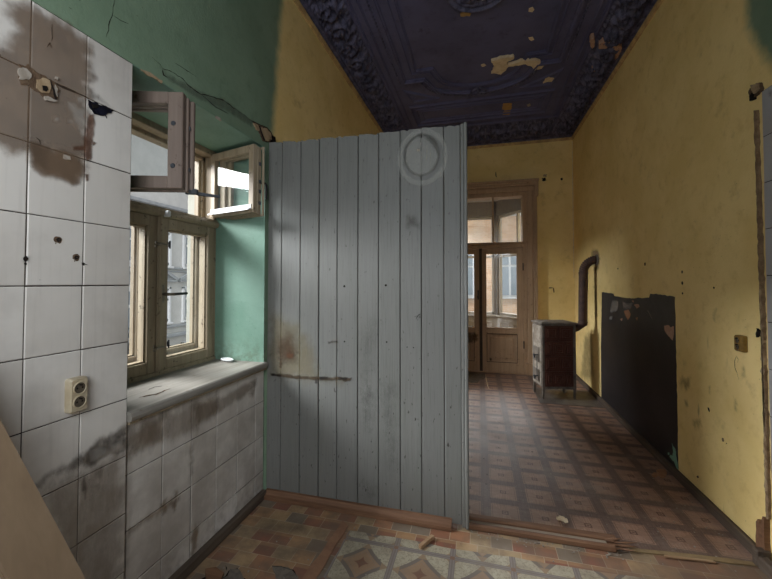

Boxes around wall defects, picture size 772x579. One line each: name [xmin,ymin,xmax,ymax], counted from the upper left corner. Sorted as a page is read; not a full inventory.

damp [0,7,90,183]
spalling [17,64,115,118]
crack [152,57,250,120]
peeling [481,54,543,75]
spalling [253,121,276,142]
spalling [748,82,772,520]